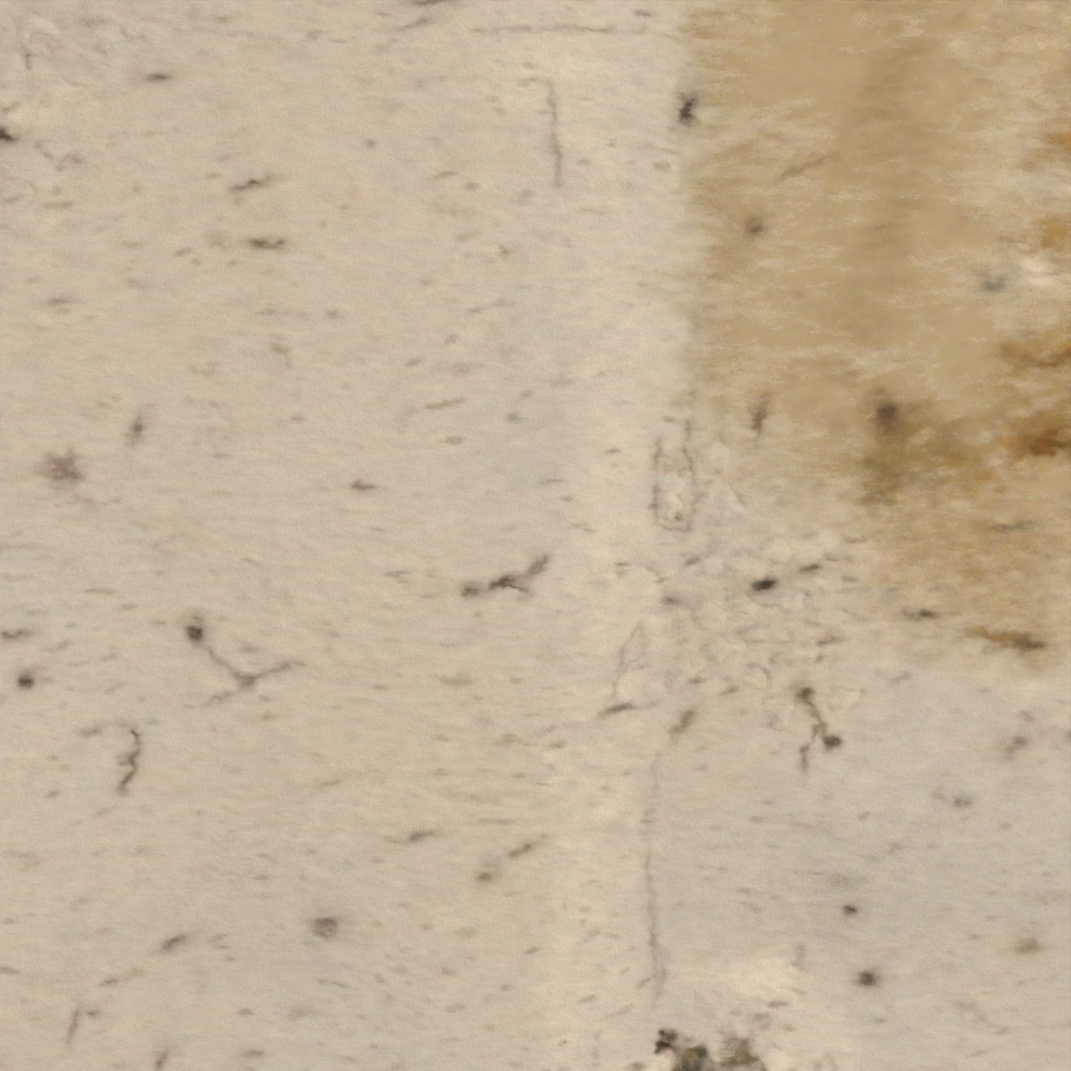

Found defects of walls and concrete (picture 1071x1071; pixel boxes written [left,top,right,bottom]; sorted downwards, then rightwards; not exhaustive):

damp [864,406,966,501]
damp [974,628,1025,641]
spalling [632,1031,789,1071]